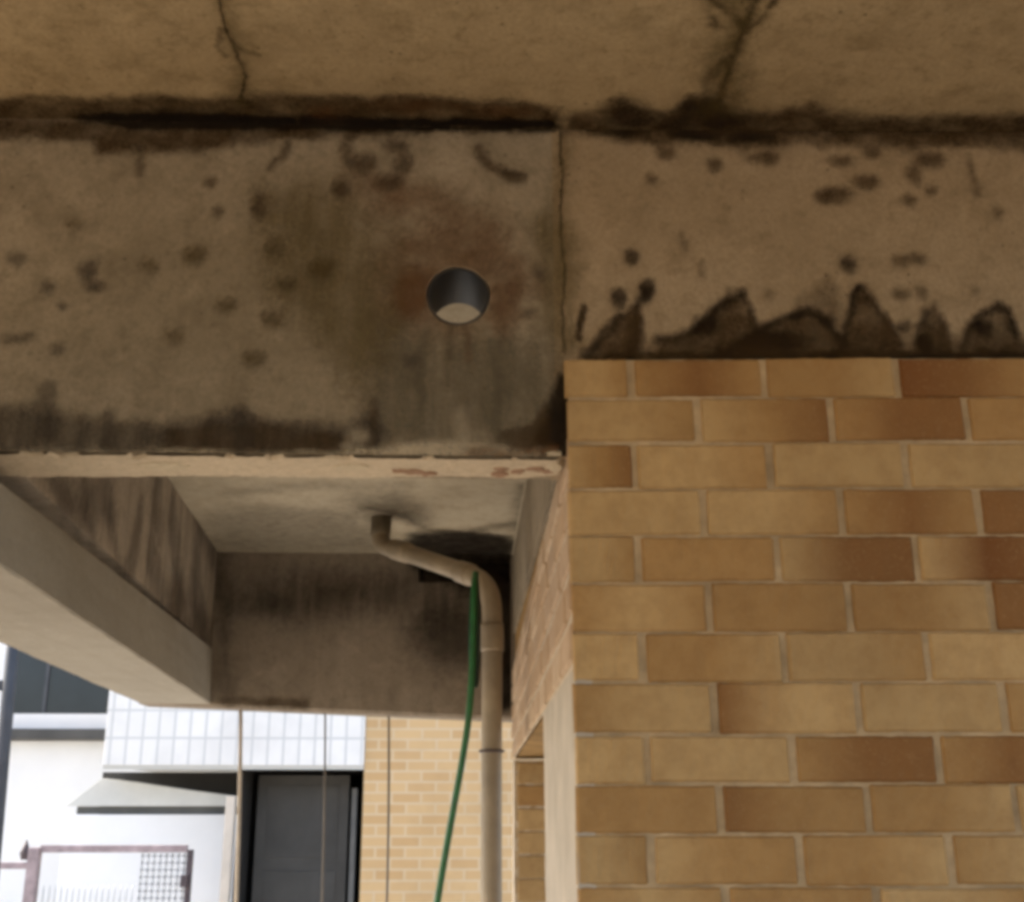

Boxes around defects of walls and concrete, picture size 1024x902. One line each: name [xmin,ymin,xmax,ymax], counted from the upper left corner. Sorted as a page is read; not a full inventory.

crack [219,9,247,98]
crack [711,0,777,115]
damp [0,94,1024,180]
damp [578,279,1024,360]
damp [198,412,381,454]